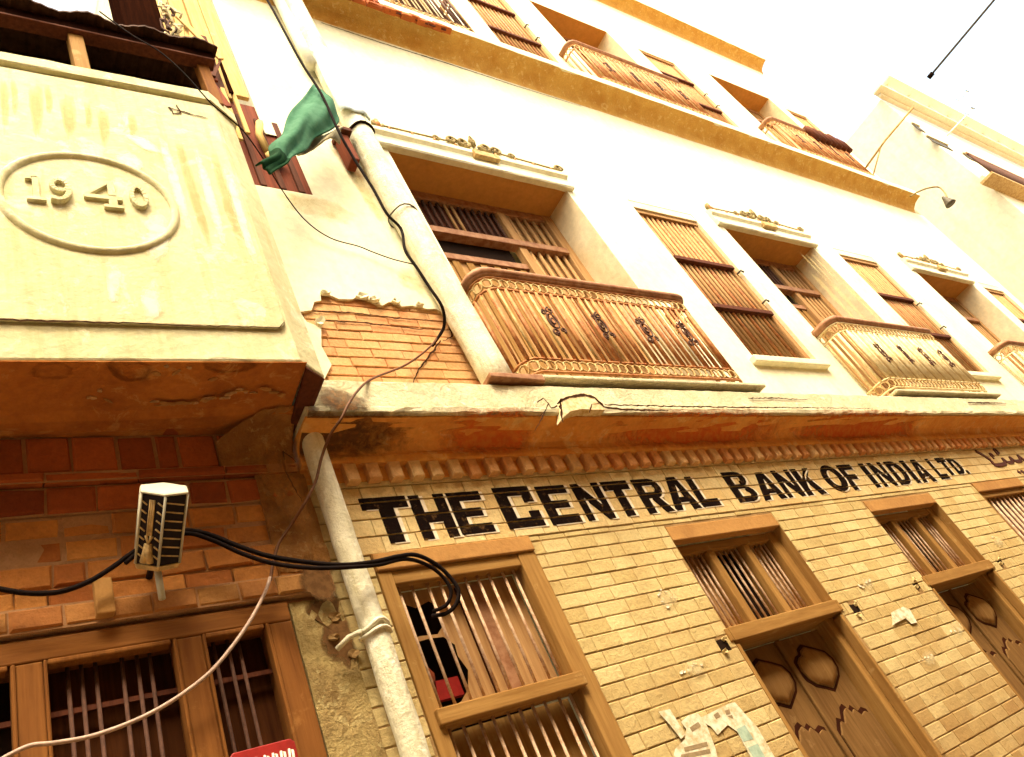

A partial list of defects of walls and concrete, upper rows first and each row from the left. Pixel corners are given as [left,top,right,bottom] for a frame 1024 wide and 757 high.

flaking render [302,290,481,385]
water stain [299,387,400,456]
crack [535,393,829,430]